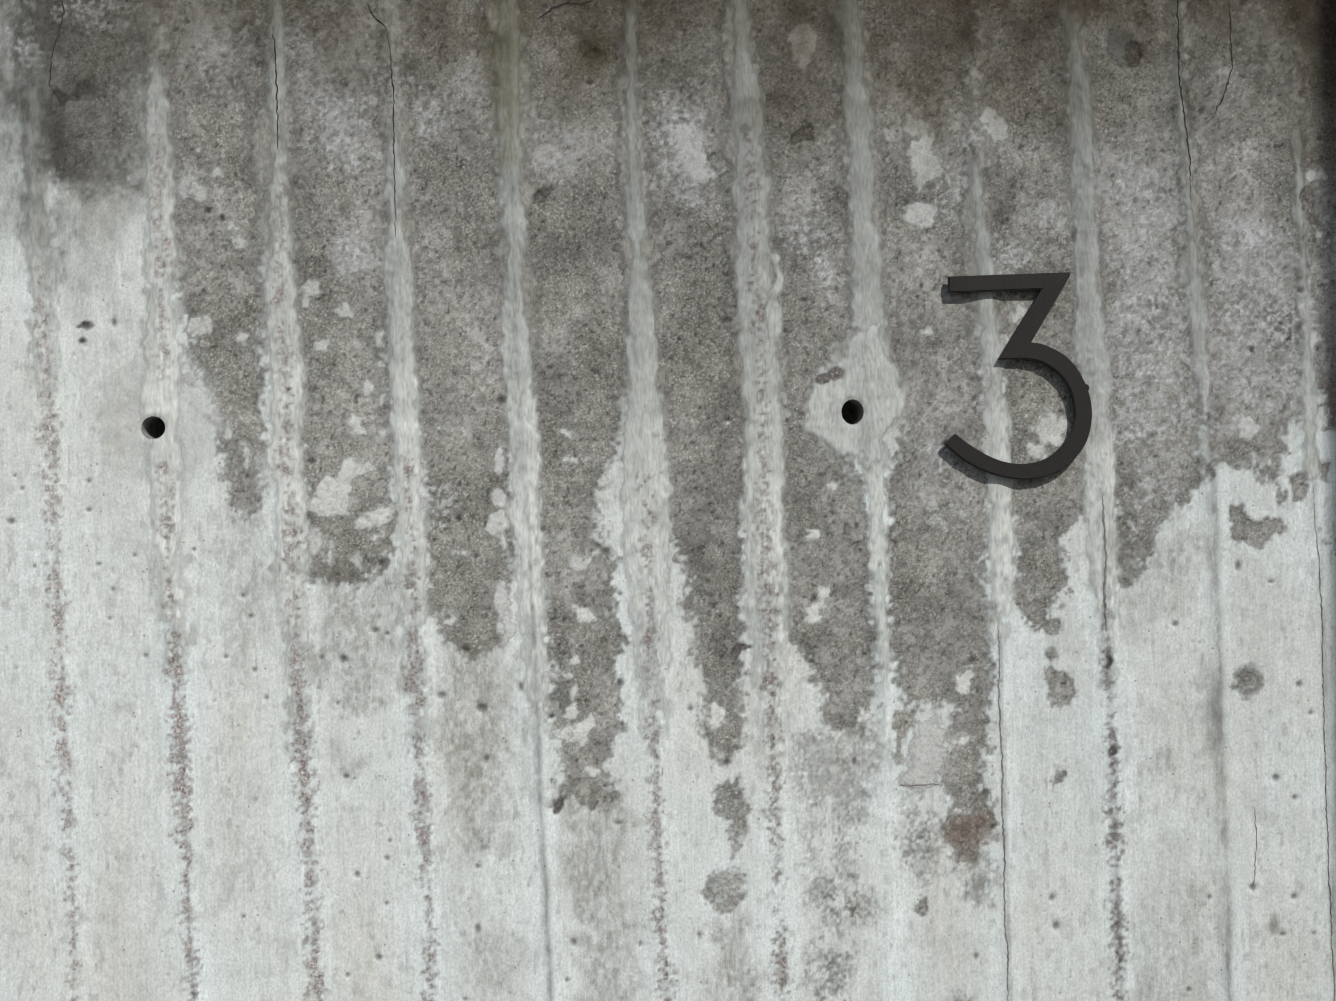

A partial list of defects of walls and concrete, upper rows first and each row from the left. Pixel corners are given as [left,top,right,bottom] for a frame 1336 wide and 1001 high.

efflorescence [296,24,404,173]
efflorescence [653,79,718,205]
crack [1176,0,1233,198]
leakage [330,224,381,280]
leakage [786,196,835,302]
leakage [1100,161,1207,440]
leakage [1212,213,1316,428]
crack [997,626,1009,1001]
crack [1314,495,1335,1001]